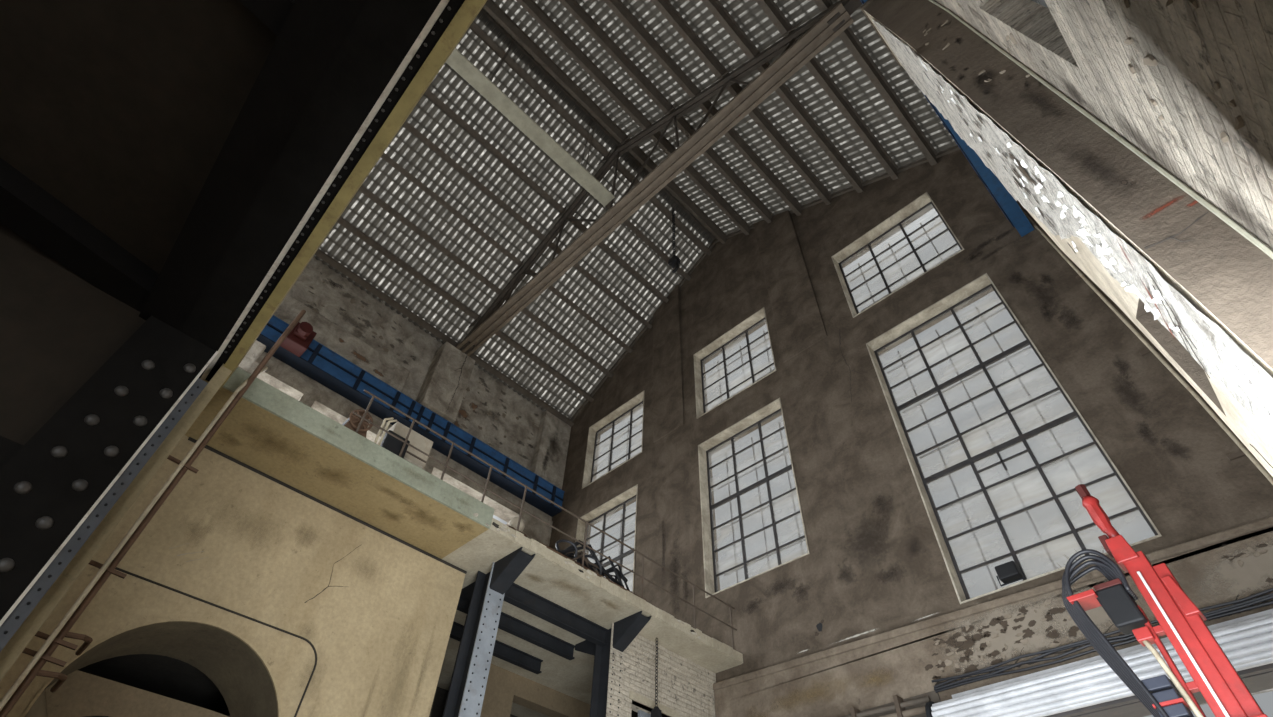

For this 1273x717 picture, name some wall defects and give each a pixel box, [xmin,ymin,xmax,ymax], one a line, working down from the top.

crack [1145,212,1211,379]
crack [305,545,361,603]
flaking render [1202,543,1273,598]
flaking render [925,594,1112,680]